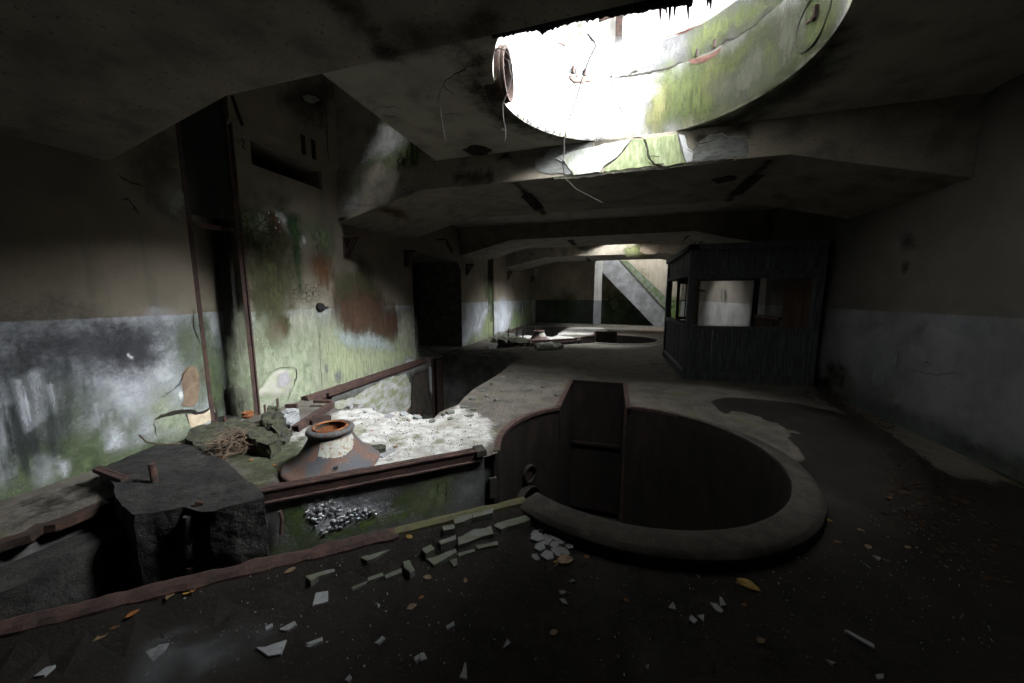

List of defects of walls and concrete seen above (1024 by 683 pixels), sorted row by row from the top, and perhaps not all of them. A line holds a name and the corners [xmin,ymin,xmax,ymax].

crack [606,137,720,166]
damp [241,205,306,347]
corrosion [314,255,398,343]
damp [0,322,183,482]
peeling [182,366,216,428]